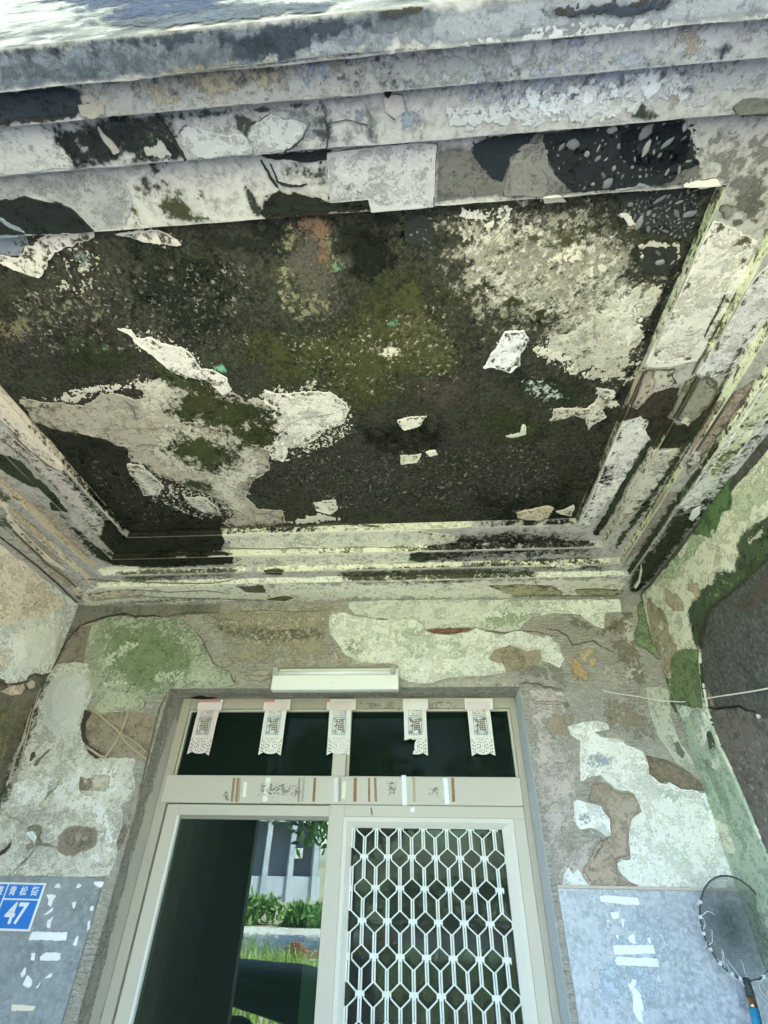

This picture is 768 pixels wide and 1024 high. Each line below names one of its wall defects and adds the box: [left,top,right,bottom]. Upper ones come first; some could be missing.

spalling [0,196,94,256]
leakage [48,430,317,581]
mould [0,193,405,372]
crack [260,102,380,192]
leakage [279,375,614,595]
mould [495,291,568,331]
spalling [437,119,725,344]
leakage [597,216,719,449]
peeling [620,320,768,564]
peeling [0,590,635,878]
crack [476,627,613,652]
peeling [528,684,768,976]